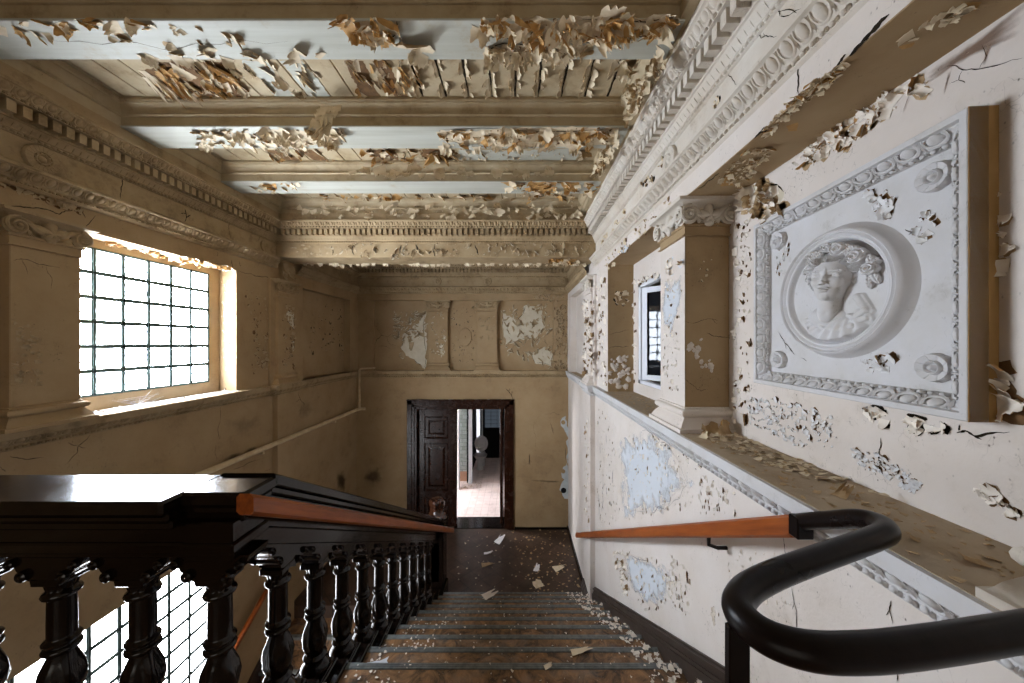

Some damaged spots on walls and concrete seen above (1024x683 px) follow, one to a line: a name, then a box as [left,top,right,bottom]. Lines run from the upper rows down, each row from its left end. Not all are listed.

peeling [0,17,347,164]
peeling [297,5,681,221]
crack [835,14,889,70]
peeling [792,73,933,171]
crack [951,46,1021,83]
peeling [862,188,897,221]
peeling [499,303,568,370]
peeling [581,195,684,391]
peeling [717,62,850,448]
peeling [584,409,736,530]
crack [957,425,1008,439]
peeling [973,482,1023,521]